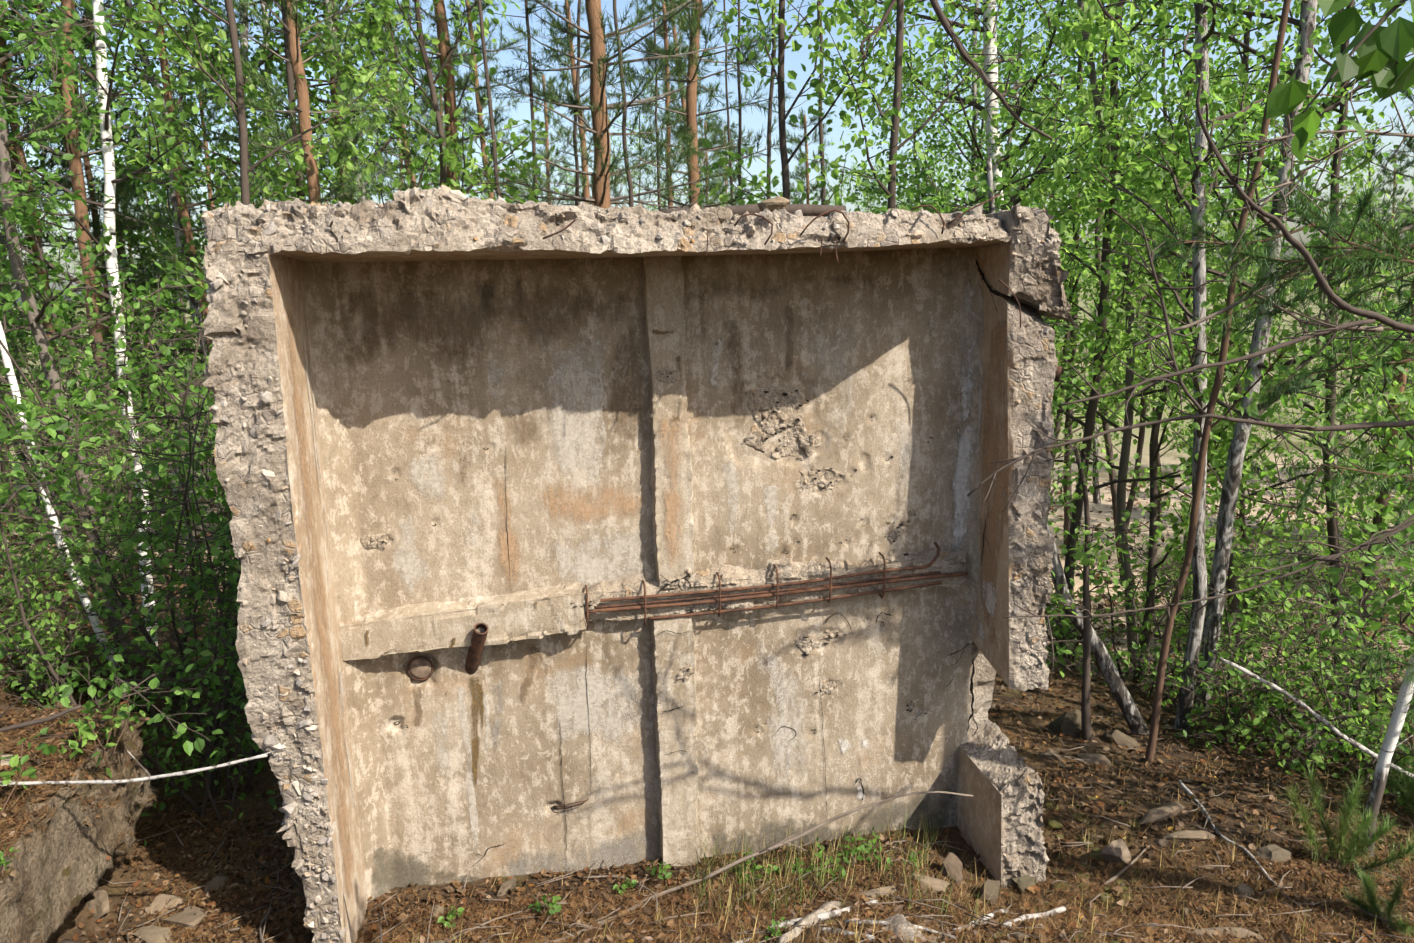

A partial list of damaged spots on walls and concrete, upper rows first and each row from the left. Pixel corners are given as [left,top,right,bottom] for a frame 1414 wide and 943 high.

crack [976,260,1012,313]
spalling [743,386,857,495]
spalling [564,592,602,612]
corrosion [470,678,484,784]